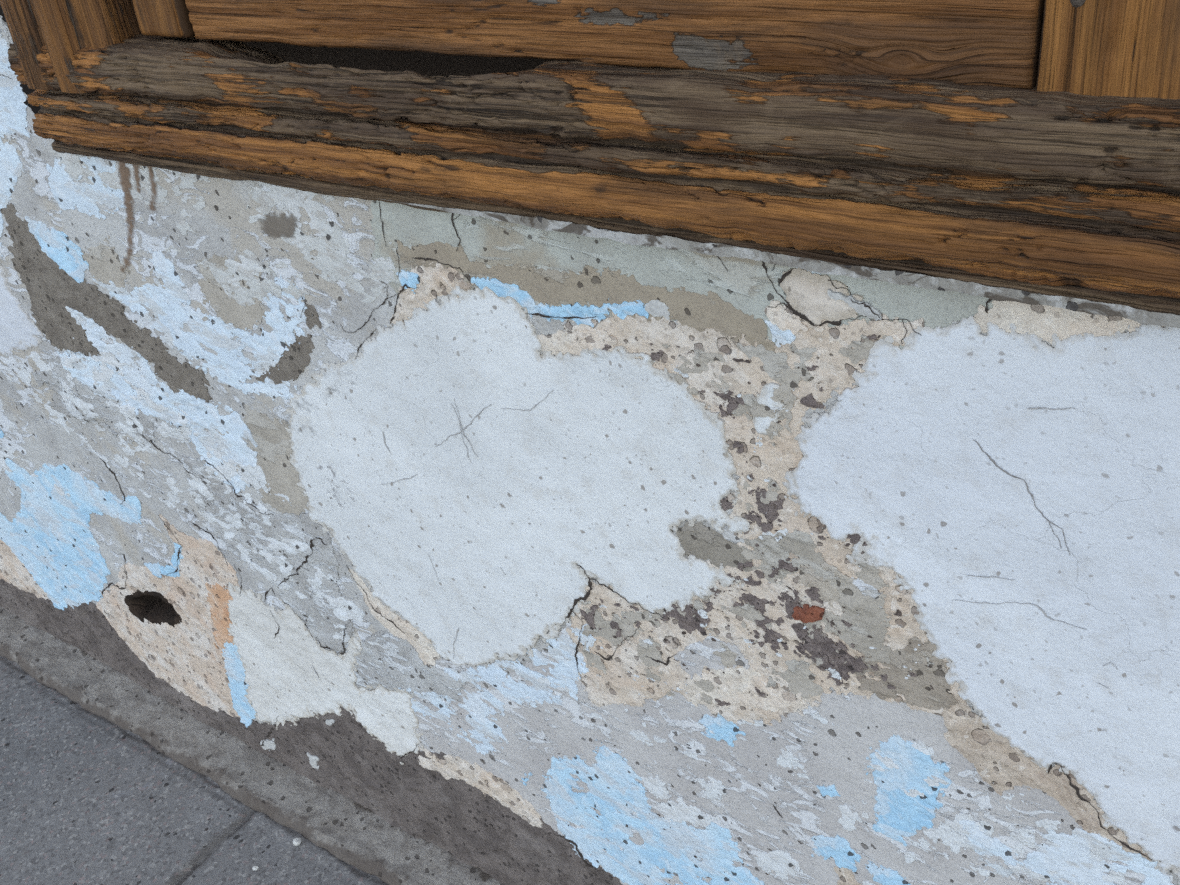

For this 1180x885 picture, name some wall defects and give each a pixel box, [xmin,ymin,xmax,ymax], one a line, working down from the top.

damp [119,162,157,271]
flaking render [0,15,622,885]
spalling [370,200,1180,726]
crack [974,440,1070,555]
flaking render [354,622,1175,885]
crack [1048,763,1155,862]